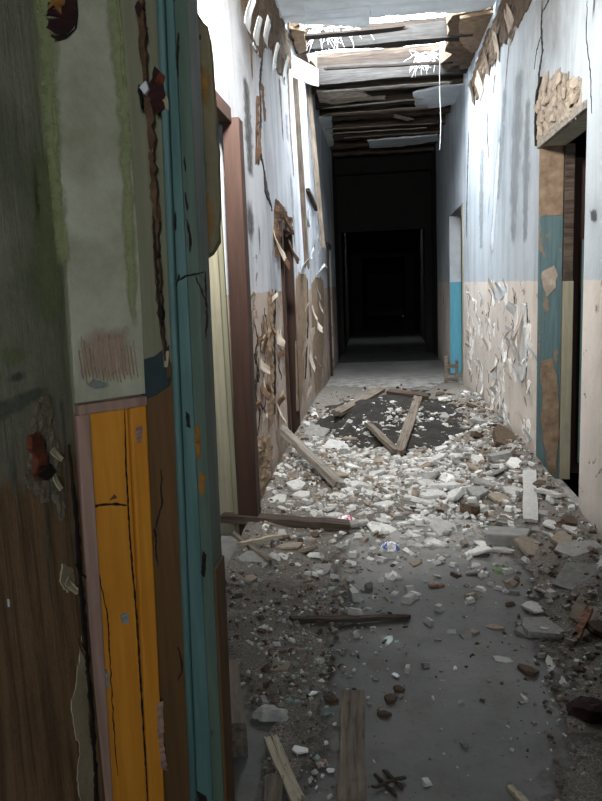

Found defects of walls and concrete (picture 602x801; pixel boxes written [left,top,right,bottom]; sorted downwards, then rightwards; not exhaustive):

spalling [46,0,78,42]
crack [255,55,273,211]
flaking render [468,0,532,106]
crack [534,0,549,82]
flaking render [533,67,582,146]
crack [585,0,593,114]
peeling [252,289,286,500]
peeling [273,216,327,412]
peeling [465,275,560,477]
crack [152,469,163,565]
crack [124,409,148,801]
peeling [71,636,94,801]